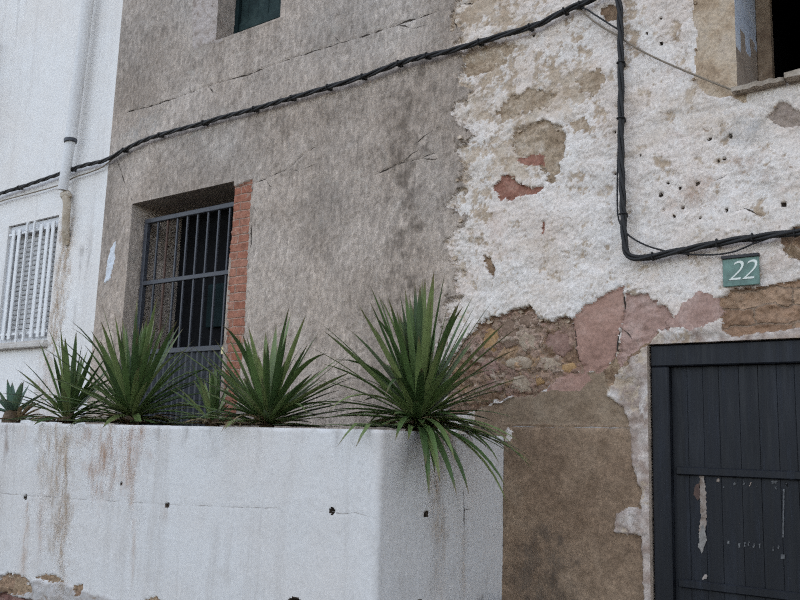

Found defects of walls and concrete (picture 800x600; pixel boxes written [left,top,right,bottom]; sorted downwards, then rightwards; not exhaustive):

crack [379,127,438,173]
flaking render [431,0,800,426]
flaking render [0,572,64,600]